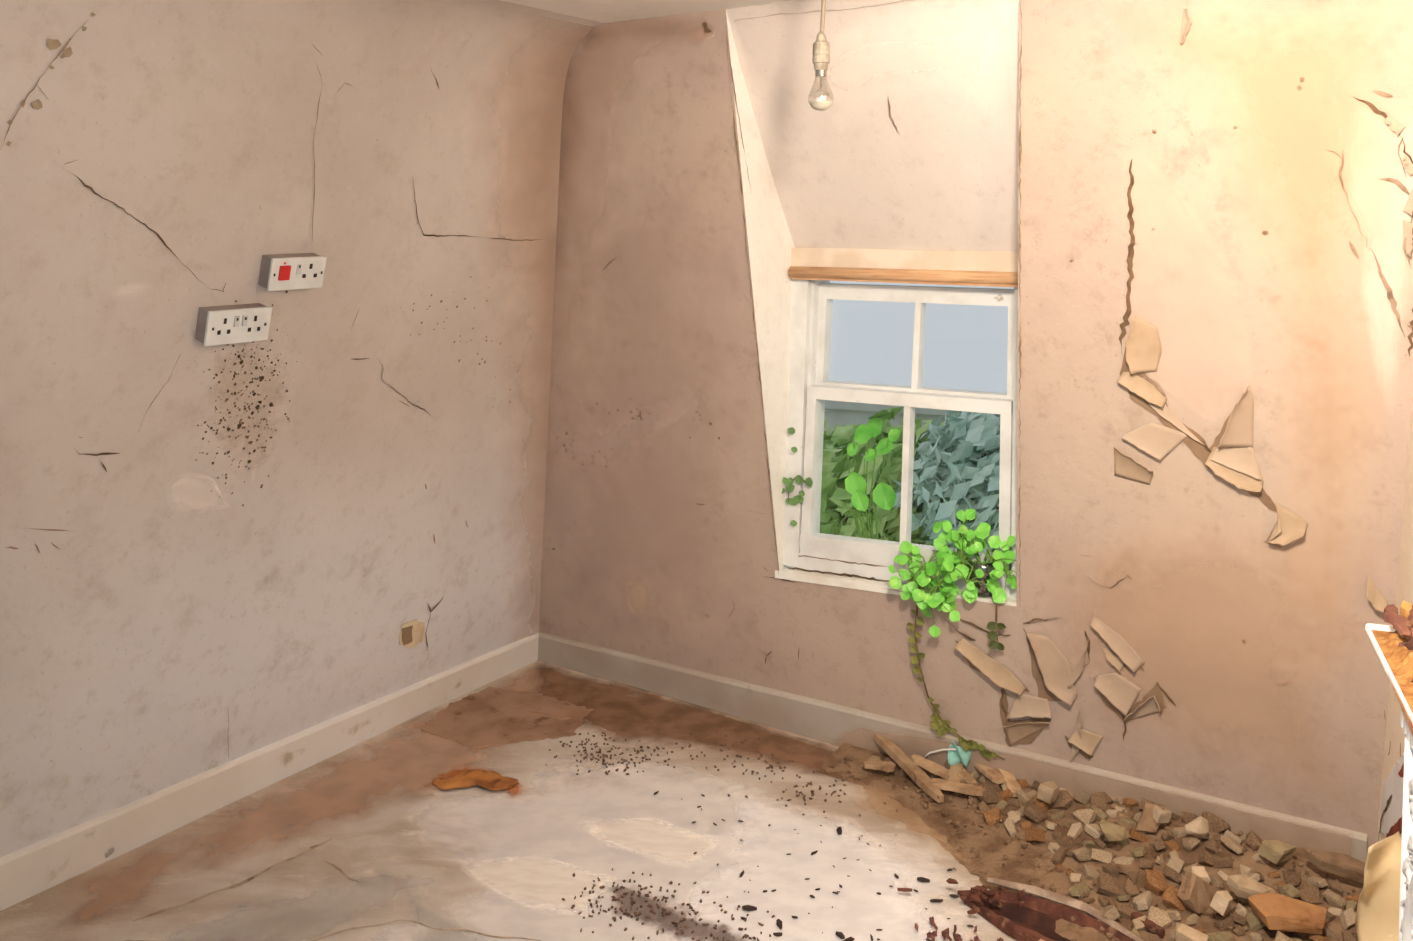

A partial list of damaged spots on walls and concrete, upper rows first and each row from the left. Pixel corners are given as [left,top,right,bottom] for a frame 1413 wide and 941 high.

crack [1,13,96,148]
crack [53,160,226,292]
crack [413,182,541,241]
leakage [195,329,297,506]
flaking render [1113,159,1308,548]
flaking render [946,616,1176,763]